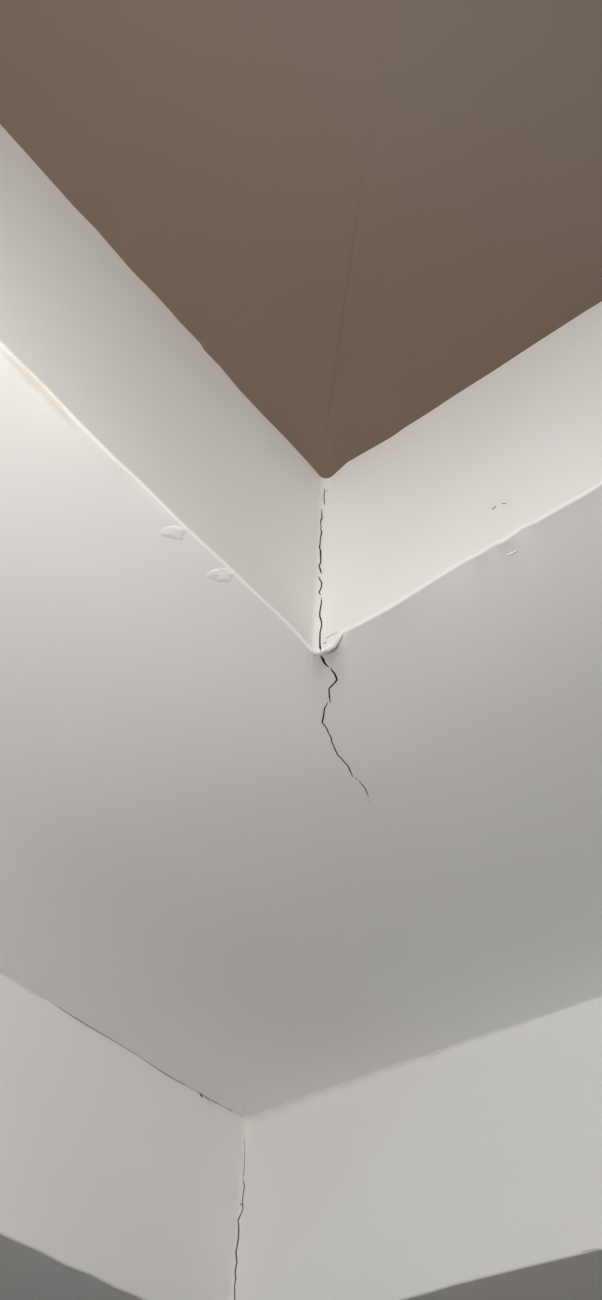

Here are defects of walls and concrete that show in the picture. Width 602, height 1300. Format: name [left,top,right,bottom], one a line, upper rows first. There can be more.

crack [318,489,369,796]
crack [234,1140,245,1300]